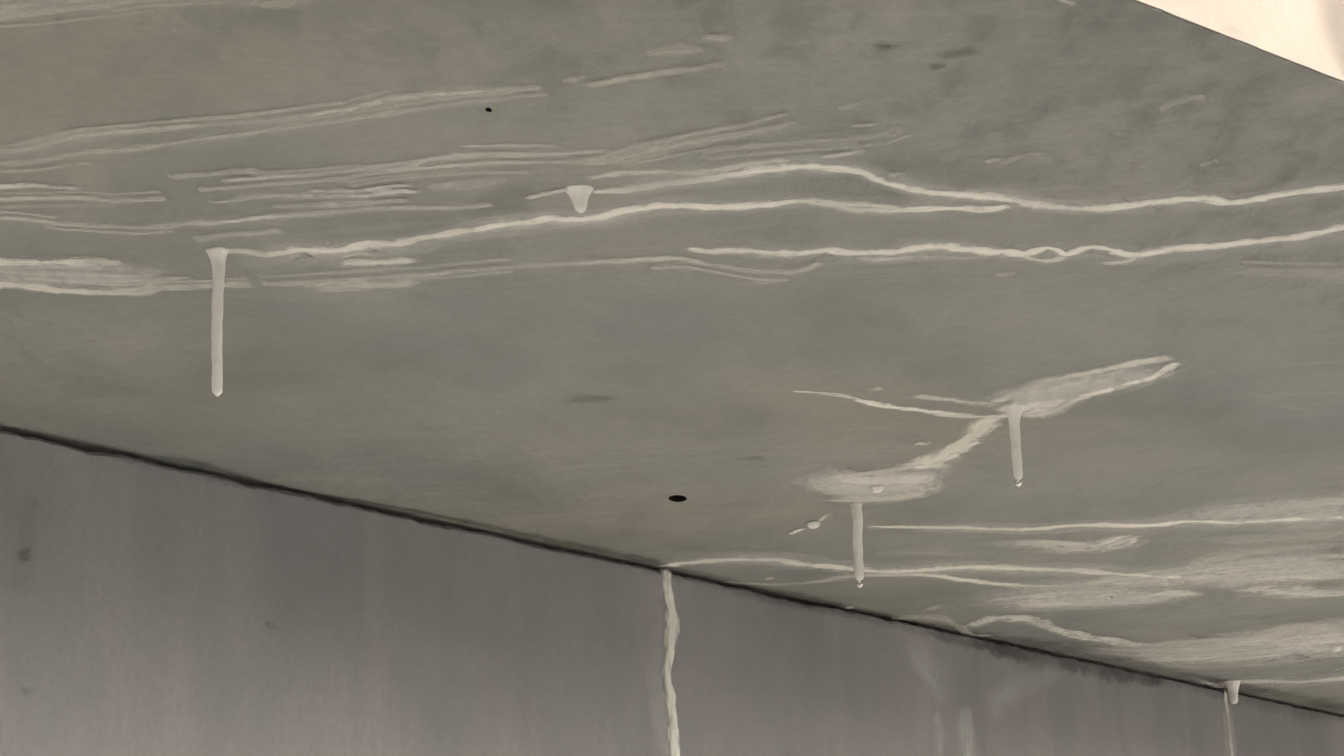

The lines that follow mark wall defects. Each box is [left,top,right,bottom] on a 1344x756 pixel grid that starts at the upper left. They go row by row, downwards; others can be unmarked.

damp [287,89,510,118]
damp [211,216,278,232]
crack [227,160,1344,266]
damp [0,257,154,295]
damp [794,356,1180,502]
damp [997,533,1142,553]
damp [965,554,1344,664]